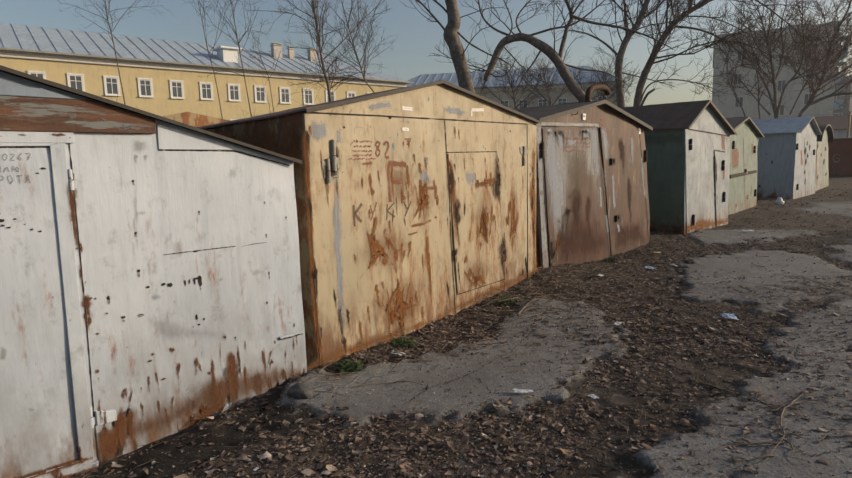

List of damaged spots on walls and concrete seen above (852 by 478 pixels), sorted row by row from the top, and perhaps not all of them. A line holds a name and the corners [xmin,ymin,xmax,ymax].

rust [20,127,424,478]
rust [368,141,439,301]
rust [447,160,474,232]
rust [452,153,541,309]
rust [615,178,644,248]